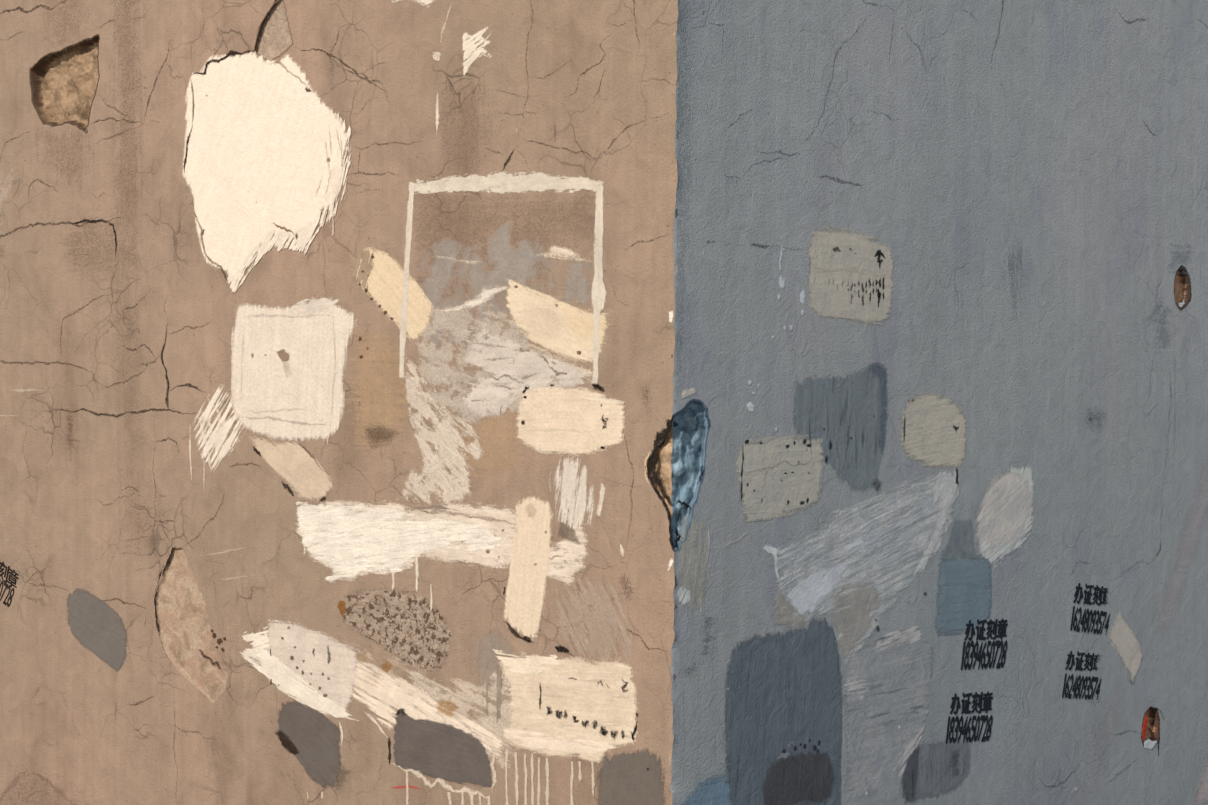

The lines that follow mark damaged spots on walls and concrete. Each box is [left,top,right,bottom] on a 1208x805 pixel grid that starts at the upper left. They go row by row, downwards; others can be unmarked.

crack [0,0,66,41]
flaking render [253,0,293,61]
flaking render [29,34,100,132]
crack [485,0,665,171]
crack [725,1,921,178]
crack [85,6,389,281]
crack [347,141,419,193]
crack [1,179,132,255]
flaking render [1174,265,1192,311]
crack [2,295,260,606]
spalling [644,399,711,551]
flaking render [1141,706,1163,757]